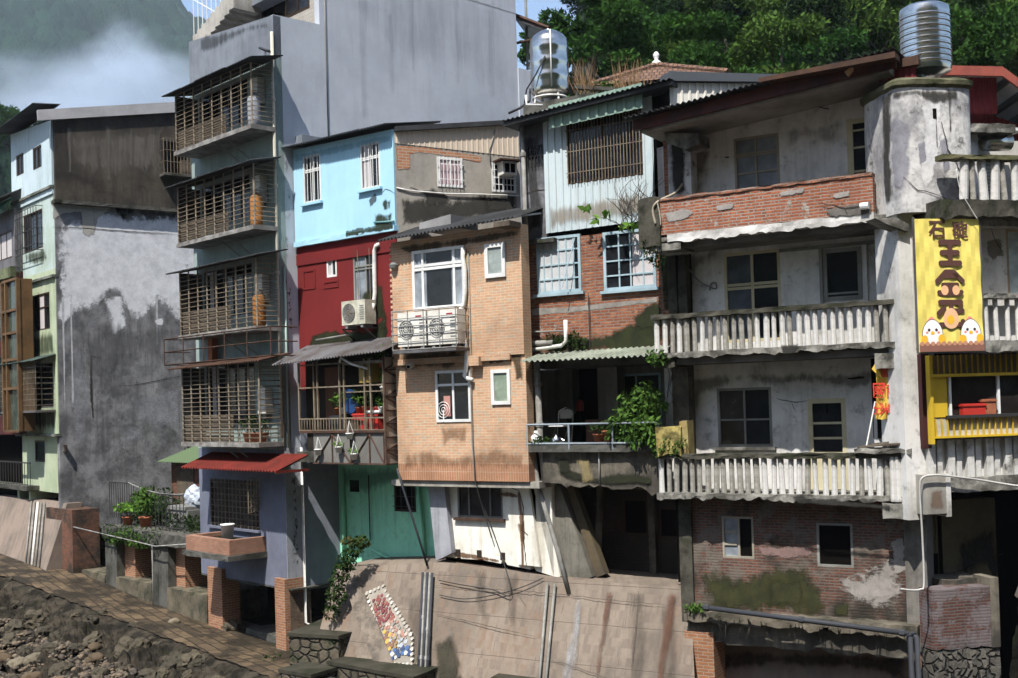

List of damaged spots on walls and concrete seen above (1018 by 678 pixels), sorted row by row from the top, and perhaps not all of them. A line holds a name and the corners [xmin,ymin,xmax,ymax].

leakage [346,189,515,237]